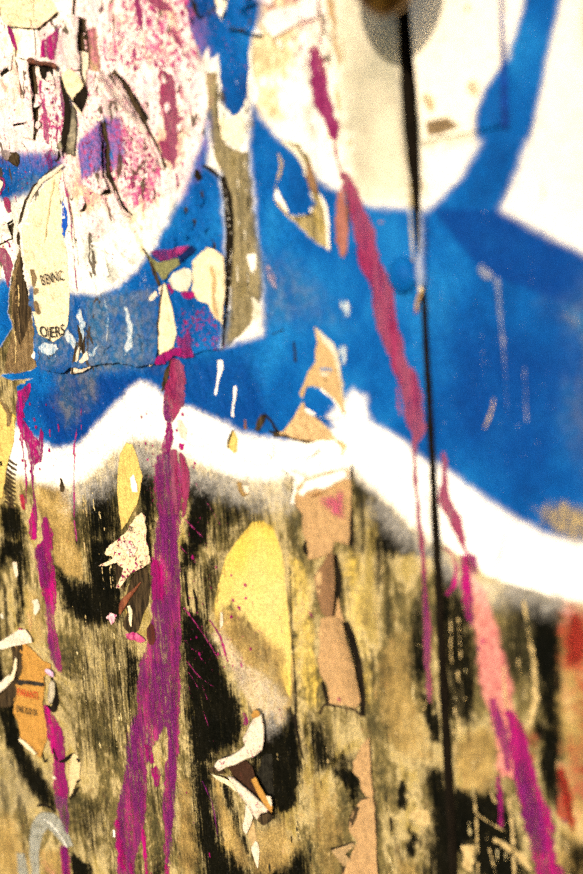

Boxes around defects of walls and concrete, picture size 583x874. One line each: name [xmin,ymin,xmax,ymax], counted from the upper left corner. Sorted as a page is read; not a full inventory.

peeling [31,72,55,108]
peeling [161,71,192,92]
peeling [50,148,62,162]
peeling [77,195,87,212]
peeling [273,141,329,249]
peeling [273,326,347,456]
peeling [227,414,265,454]
peeling [42,748,81,800]